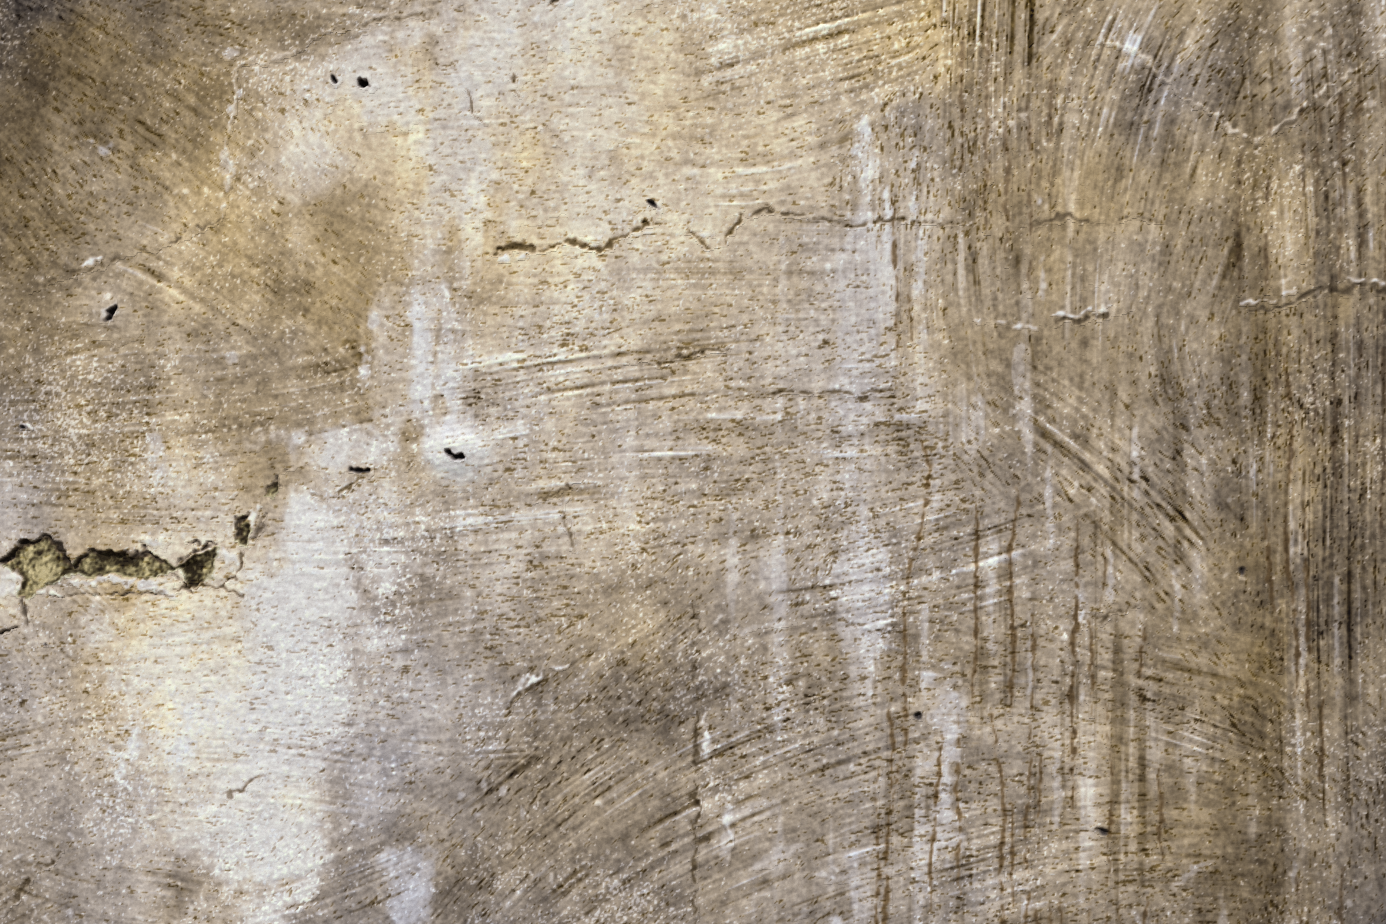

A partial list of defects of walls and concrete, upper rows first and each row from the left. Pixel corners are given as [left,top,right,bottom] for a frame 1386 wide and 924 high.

crack [542,0,576,10]
crack [1087,35,1386,148]
crack [484,202,967,263]
crack [1239,275,1386,314]
spalling [0,467,289,628]
crack [0,625,20,637]